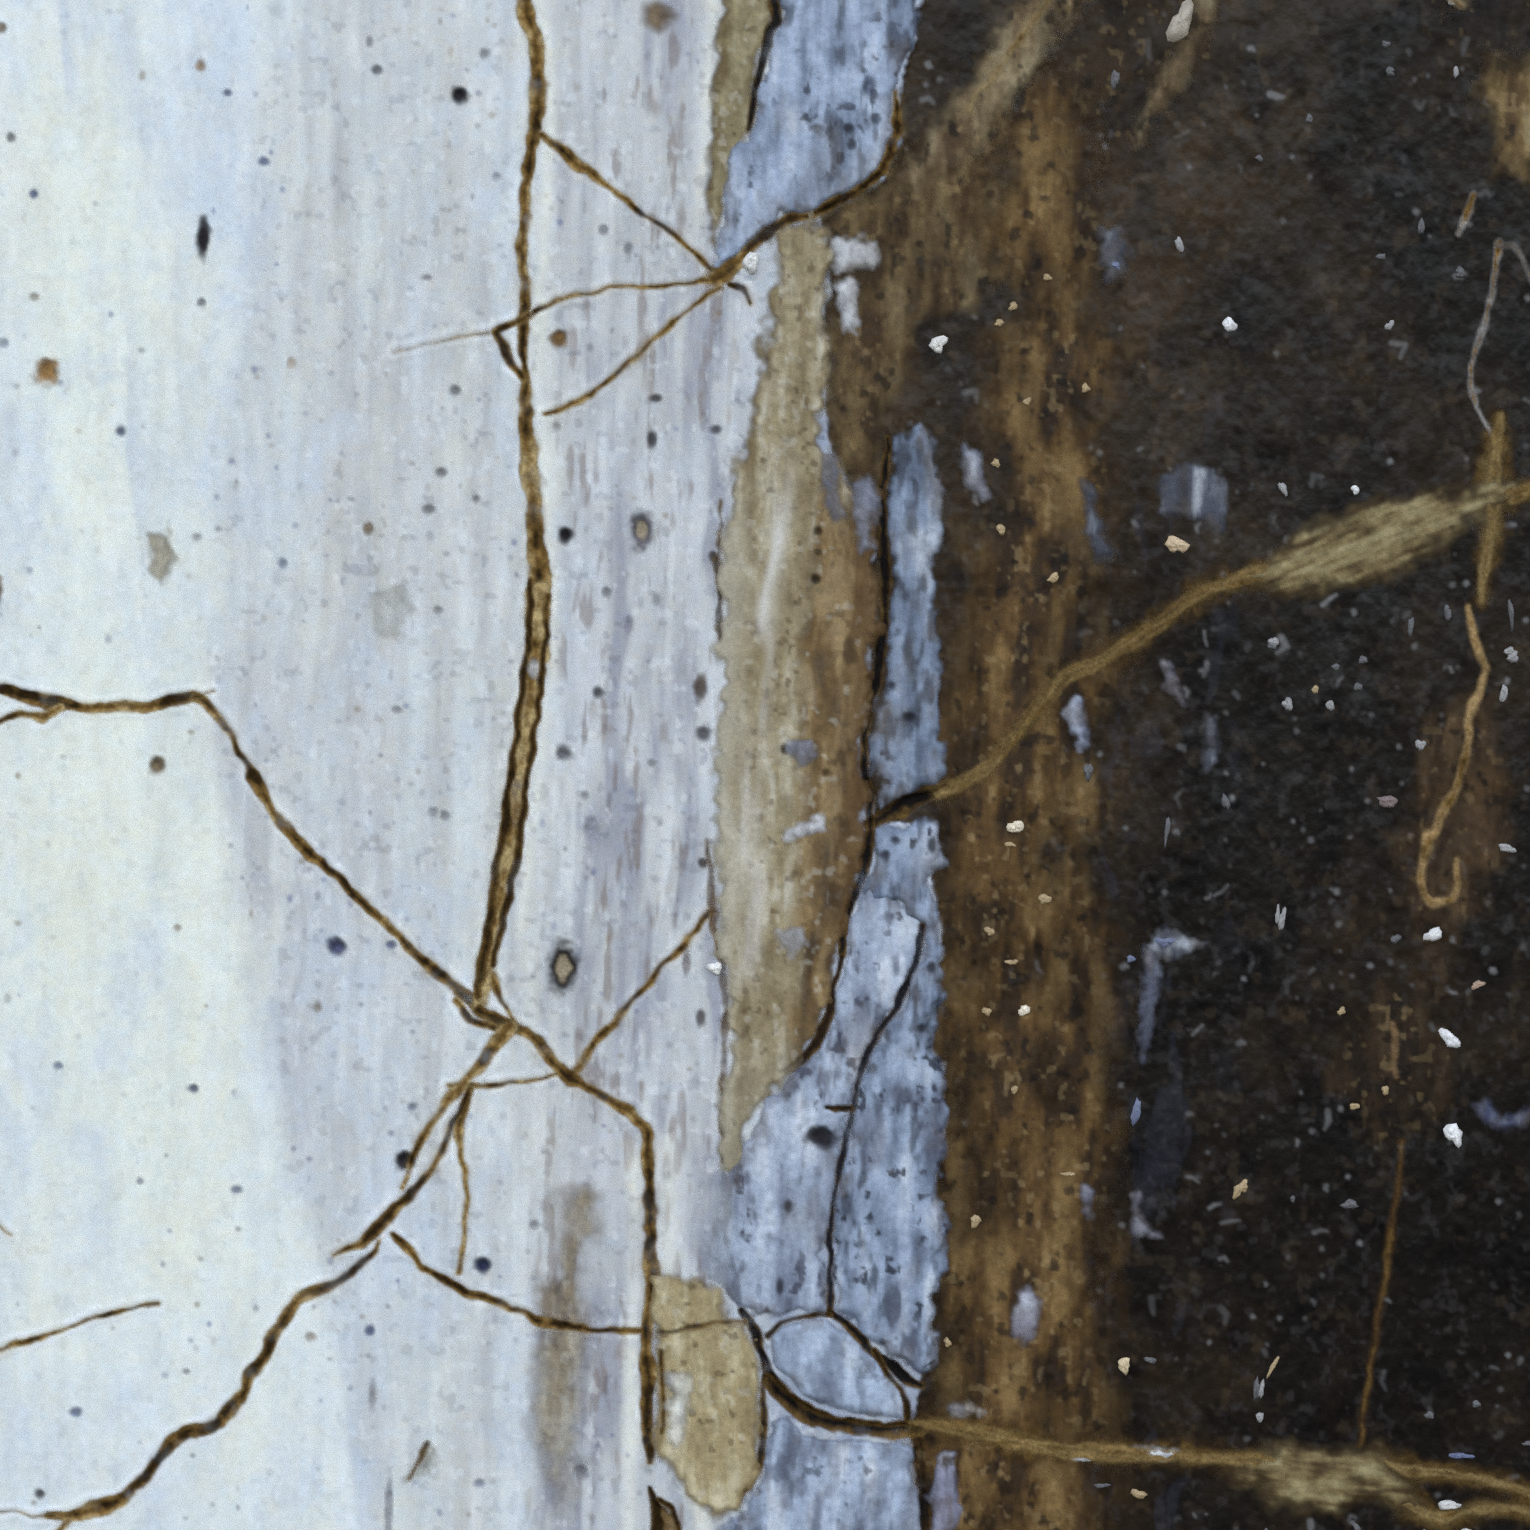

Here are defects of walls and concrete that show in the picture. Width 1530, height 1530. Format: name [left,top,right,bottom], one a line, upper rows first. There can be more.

crack [0,0,902,1530]
peeling [648,0,962,1530]
peeling [963,445,990,500]
crack [864,192,1530,908]
crack [738,922,1530,1530]